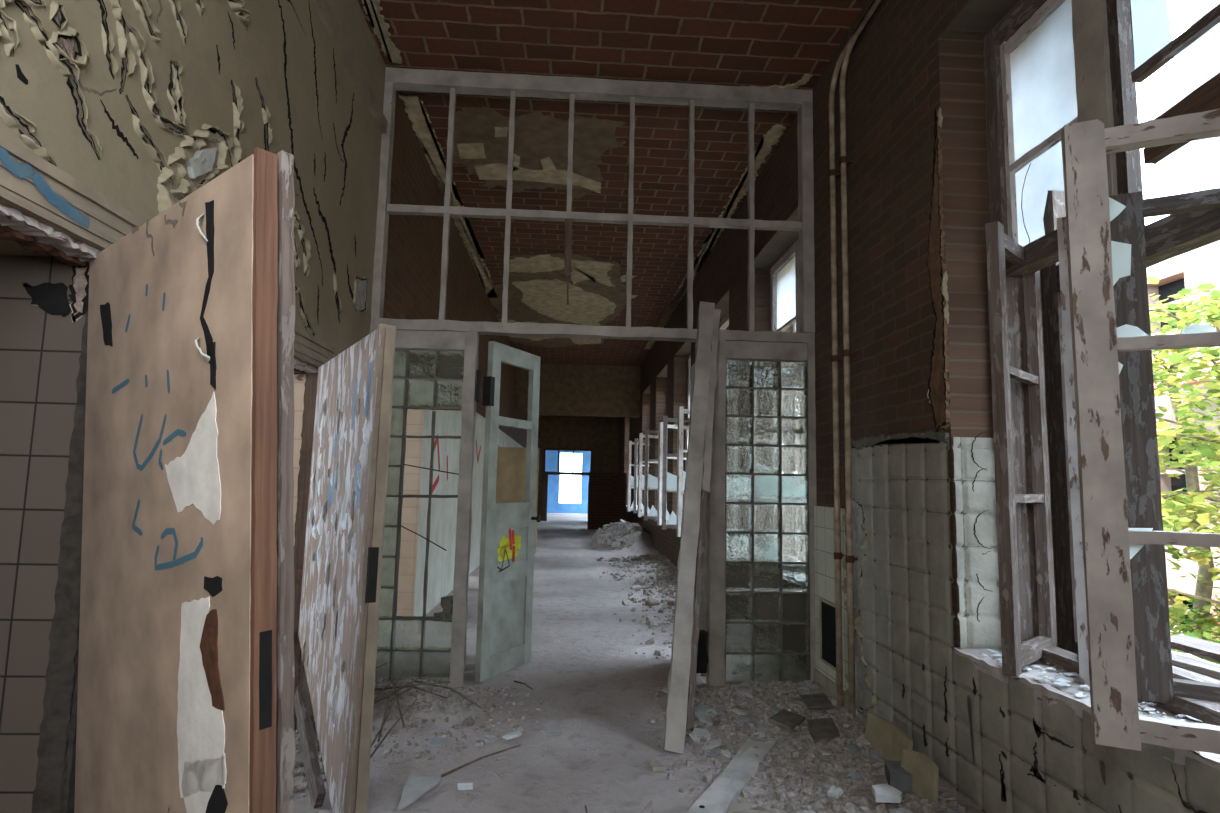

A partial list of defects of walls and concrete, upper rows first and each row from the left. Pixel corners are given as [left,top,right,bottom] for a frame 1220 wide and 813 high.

spalling [0,0,244,214]
crack [216,7,247,74]
peeling [226,0,252,26]
peeling [255,77,273,152]
crack [278,0,357,324]
peeling [294,194,316,336]
crack [902,655,1081,806]
crack [1171,763,1207,813]